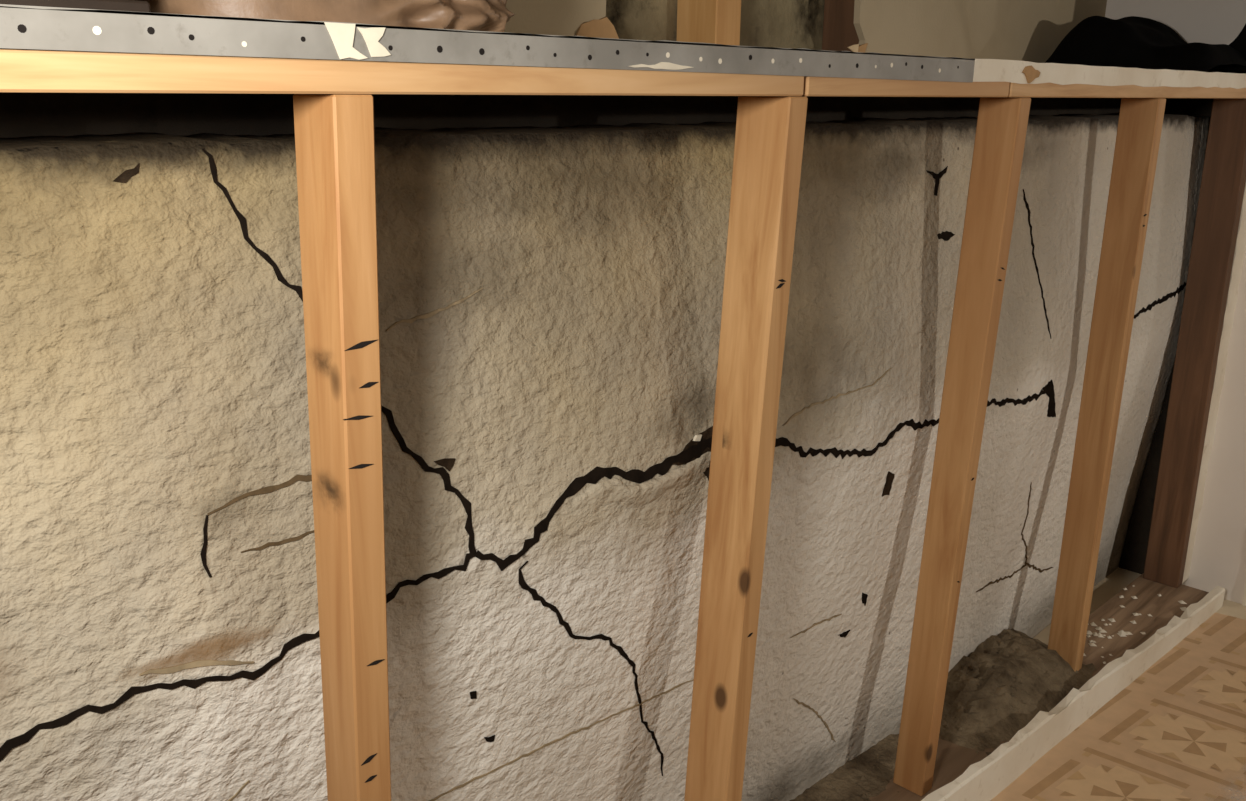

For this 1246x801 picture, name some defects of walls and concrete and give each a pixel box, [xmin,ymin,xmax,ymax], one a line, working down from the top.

crack [202,148,303,302]
crack [1023,189,1051,339]
crack [1134,282,1186,319]
crack [775,367,939,459]
crack [987,386,1053,407]
crack [200,474,314,578]
crack [976,482,1053,592]
crack [381,405,712,801]
crack [790,614,842,638]
crack [0,631,320,761]
crack [793,698,836,742]
crack [228,780,249,801]